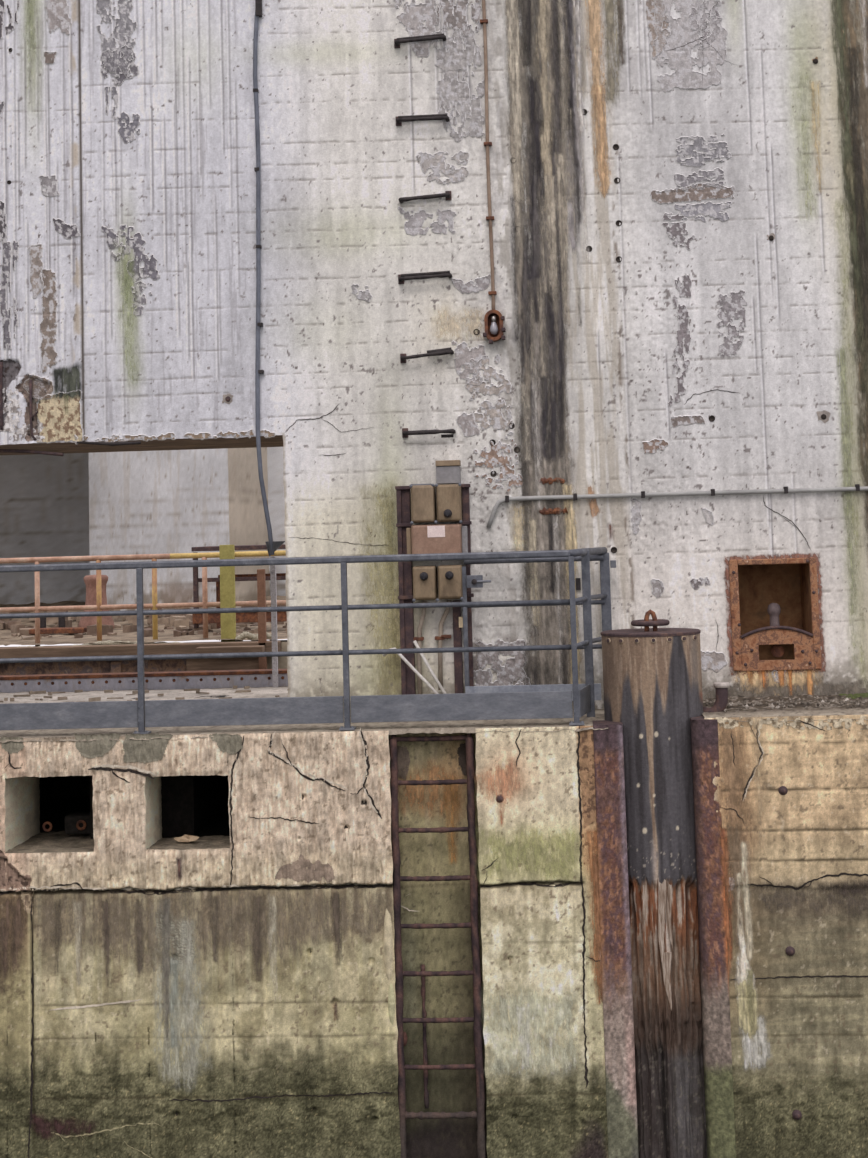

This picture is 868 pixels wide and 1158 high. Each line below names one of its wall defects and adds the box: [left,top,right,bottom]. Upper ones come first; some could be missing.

peeling [96,0,141,144]
peeling [645,0,728,92]
peeling [0,200,276,445]
leakage [505,0,585,685]
peeling [650,133,735,250]
leakage [832,0,868,518]
corrosion [725,553,826,696]
crack [0,728,392,1158]
crack [480,725,600,1087]
corrosion [587,830,603,1003]
crack [745,873,868,890]
leakage [53,1122,163,1140]